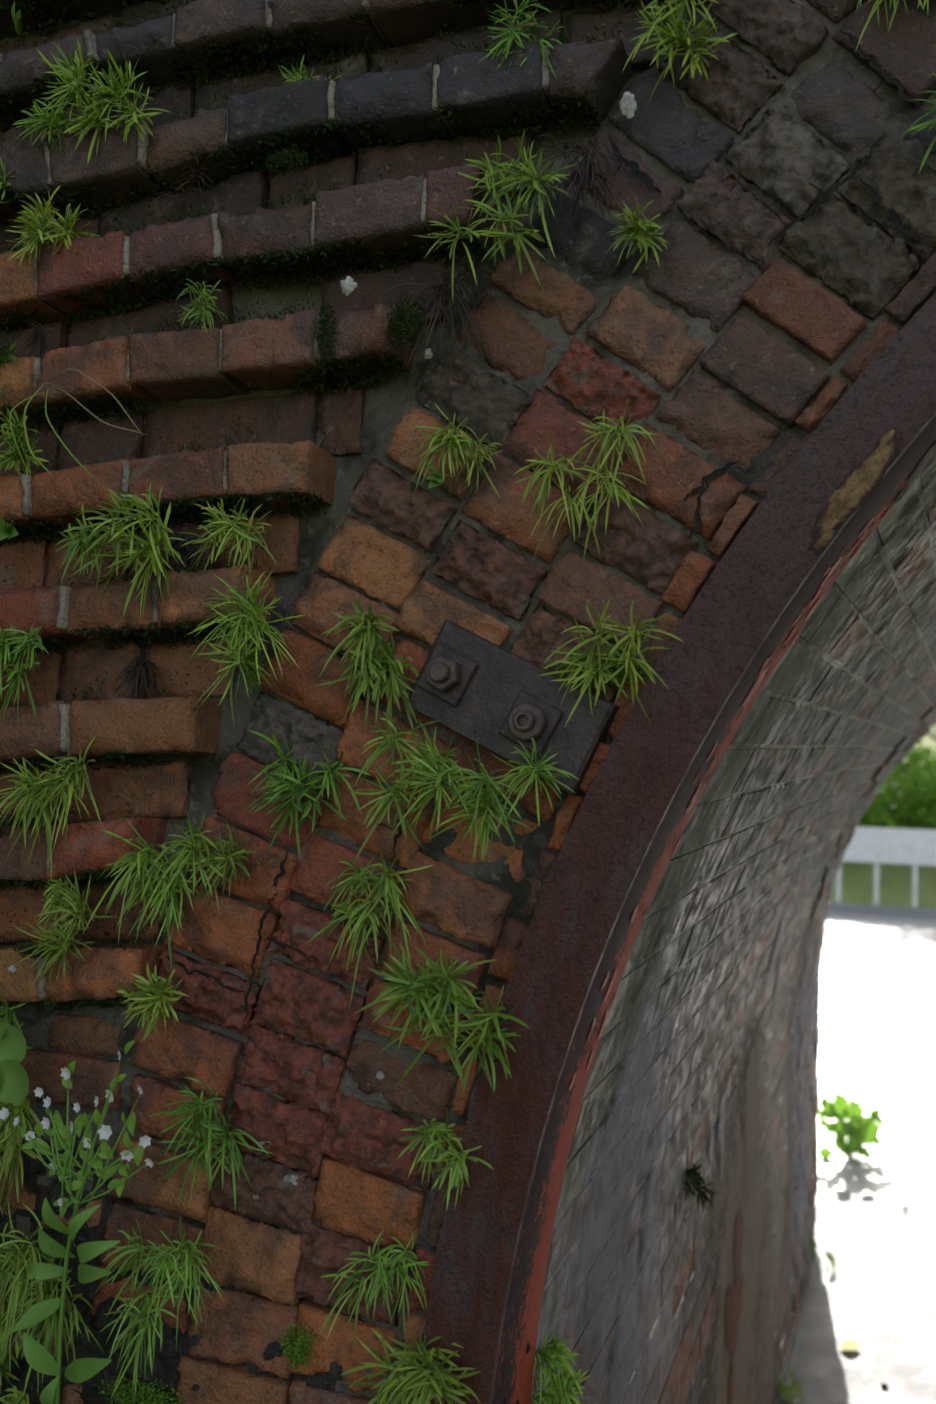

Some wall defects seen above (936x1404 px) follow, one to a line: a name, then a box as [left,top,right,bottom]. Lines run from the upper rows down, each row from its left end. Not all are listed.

crack [683,459,740,541]
peeling [742,427,936,714]
crack [161,849,315,1028]
peeling [569,963,619,1090]